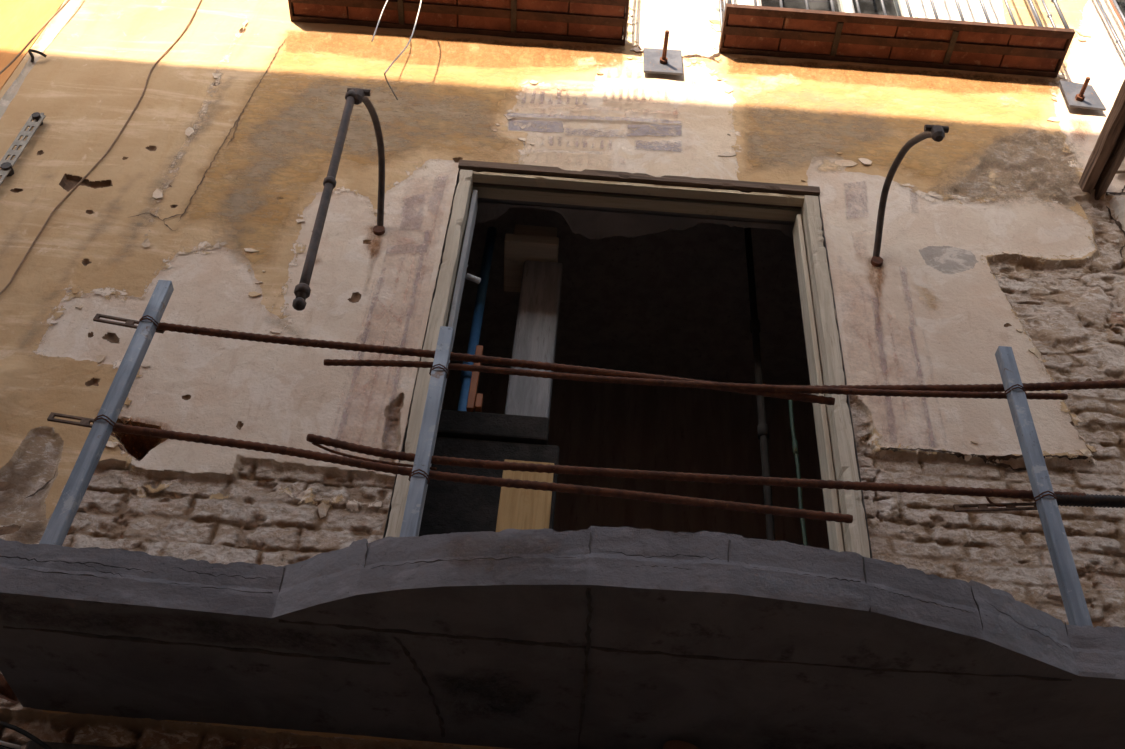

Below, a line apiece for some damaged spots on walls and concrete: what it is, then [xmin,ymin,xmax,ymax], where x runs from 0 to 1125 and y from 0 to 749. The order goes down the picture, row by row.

peeling [150,20,248,222]
peeling [31,157,463,567]
peeling [429,0,1125,628]
flaking render [0,426,65,544]
spalling [0,673,19,704]